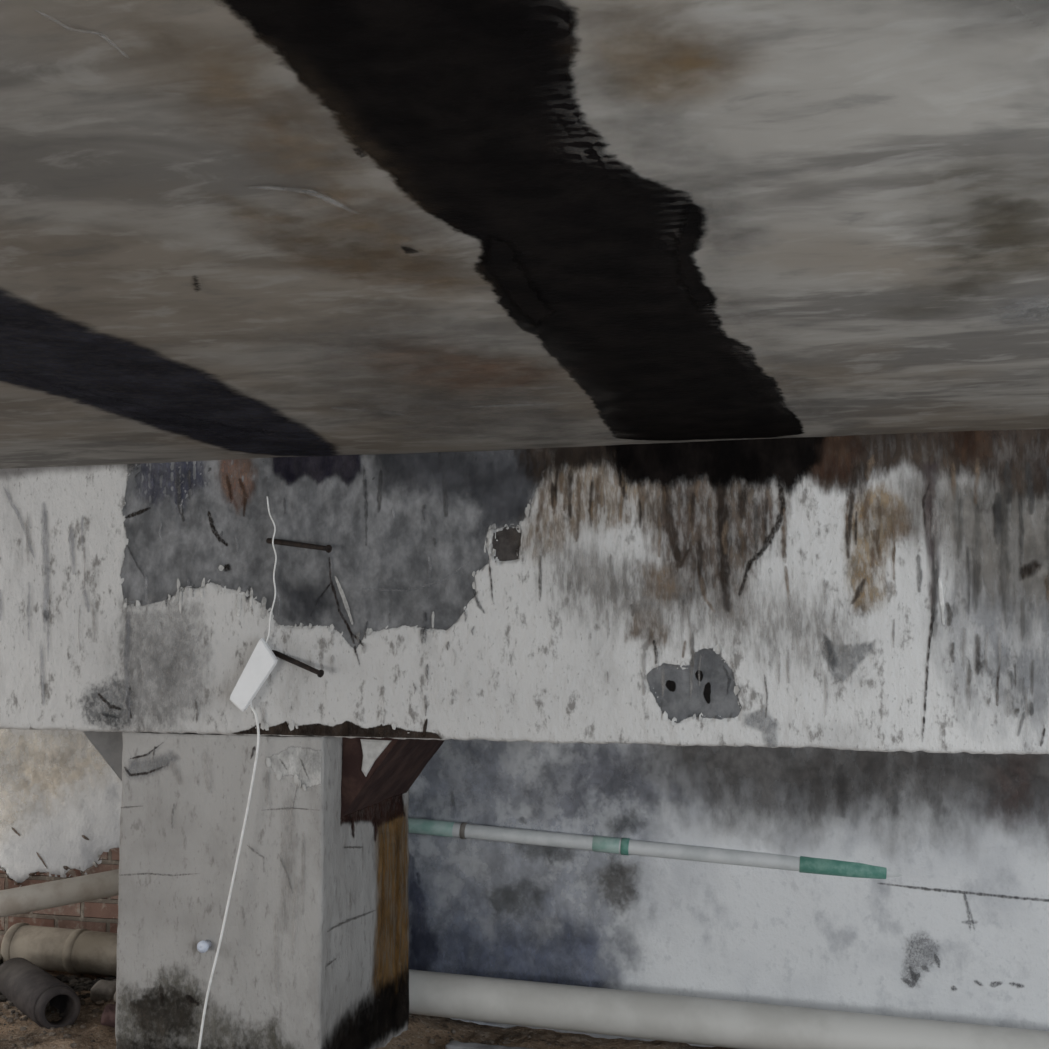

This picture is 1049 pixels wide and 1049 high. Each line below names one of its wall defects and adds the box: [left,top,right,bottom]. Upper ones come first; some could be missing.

damp [222,0,824,493]
damp [0,290,361,485]
peeling [120,451,545,648]
damp [567,559,842,684]
damp [907,471,1049,719]
peeling [647,643,776,747]
damp [408,740,649,838]
peeling [0,895,118,950]
peeling [0,848,119,890]
damp [116,968,293,1049]
damp [323,834,635,1049]
damp [904,938,940,987]